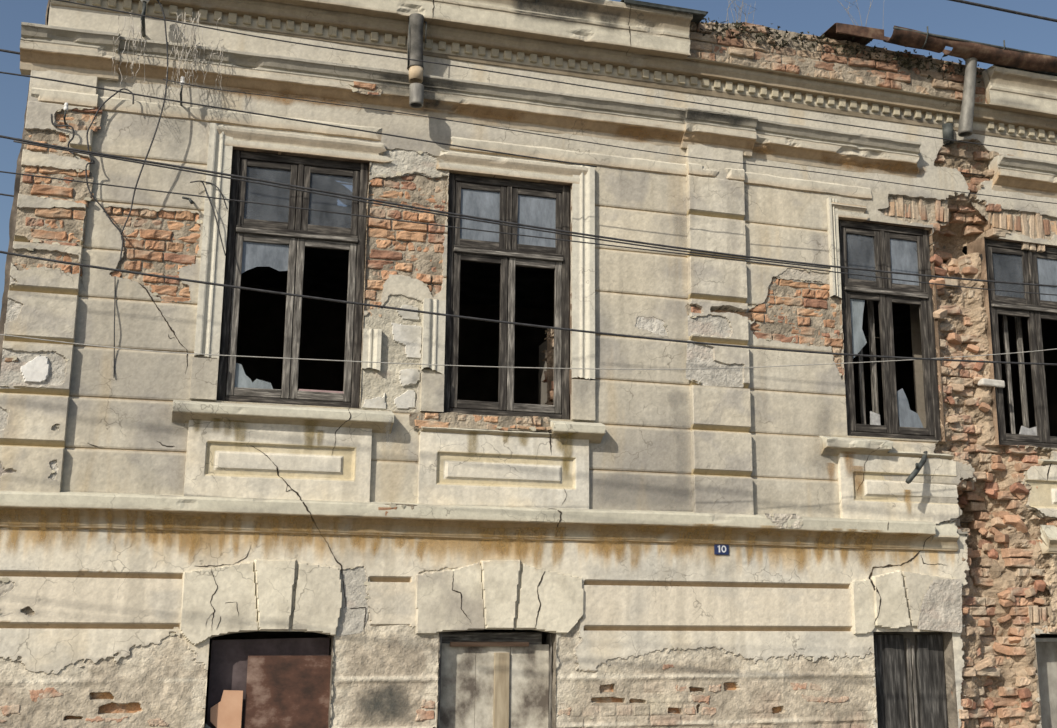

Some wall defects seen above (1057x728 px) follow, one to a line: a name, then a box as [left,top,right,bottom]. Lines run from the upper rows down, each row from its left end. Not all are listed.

flaking render [684,22,987,103]
spalling [10,107,203,303]
flaking render [0,349,69,389]
spalling [357,150,450,412]
spalling [685,267,844,387]
crack [252,446,366,626]
crack [199,546,251,629]
crack [534,572,545,629]
flaking render [917,579,962,633]
spalling [1044,555,1057,631]
spalling [0,627,207,728]
spalling [556,617,877,728]